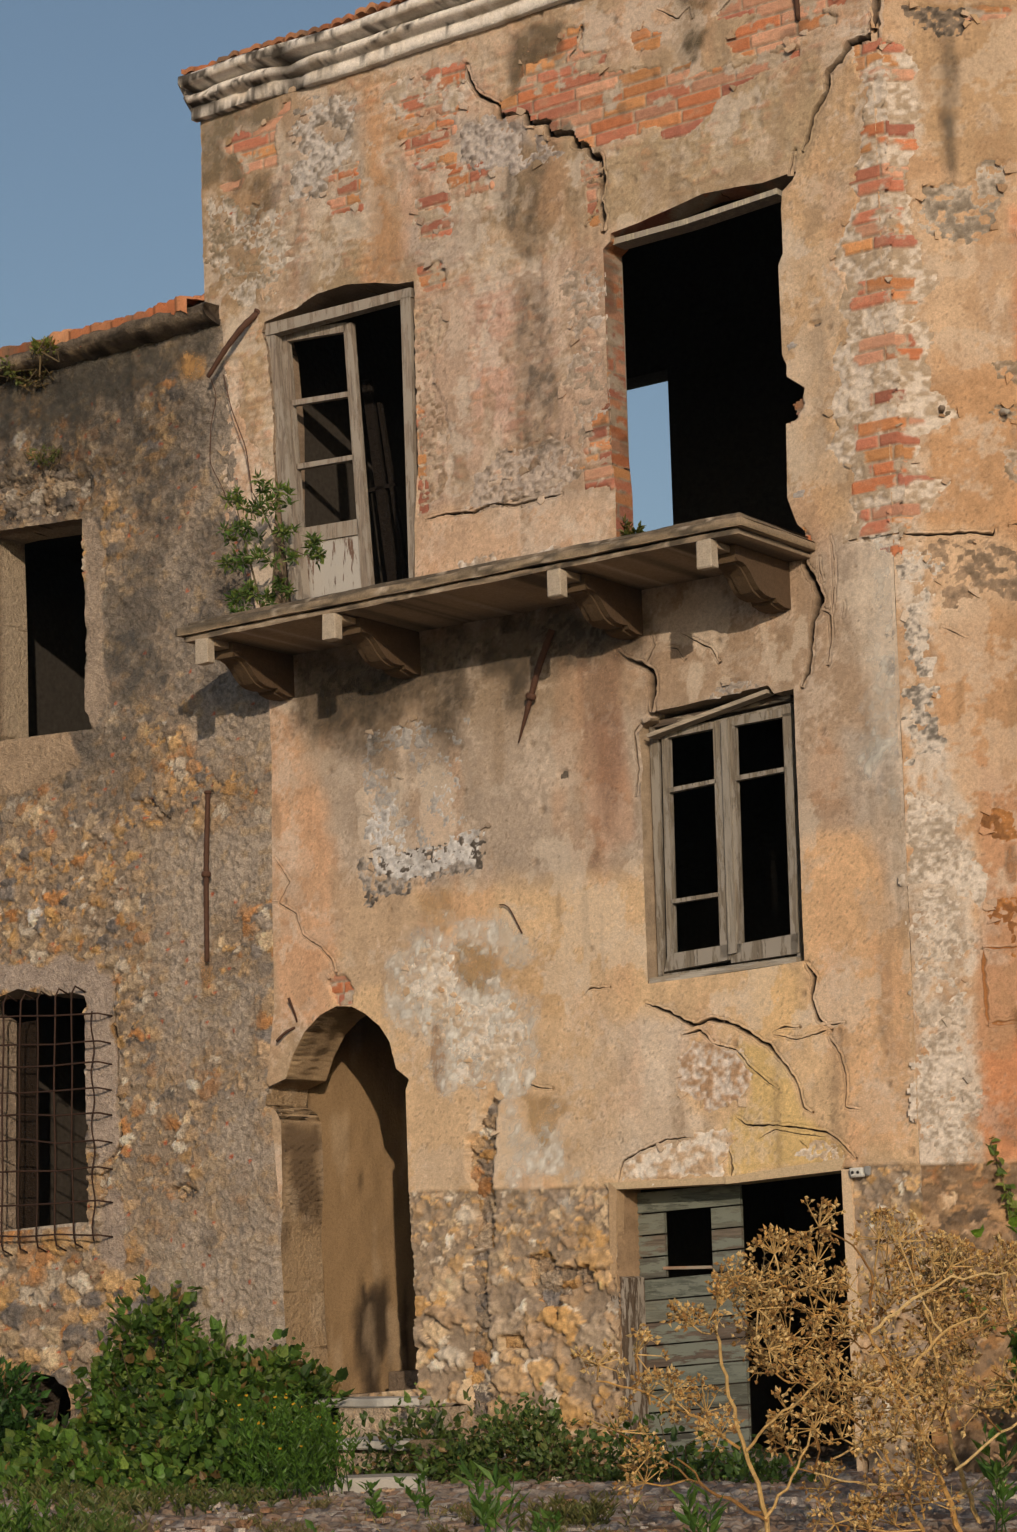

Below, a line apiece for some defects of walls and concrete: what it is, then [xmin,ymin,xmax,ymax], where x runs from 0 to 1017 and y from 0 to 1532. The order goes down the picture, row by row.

flaking render [203,95,364,307]
crack [464,65,609,231]
spalling [380,0,846,517]
crack [787,0,885,176]
flaking render [217,361,275,535]
crack [800,535,846,688]
spalling [823,37,1017,766]
crack [902,521,1017,539]
crack [616,631,722,796]
flaking render [356,715,491,908]
flaking render [621,1040,754,1181]
crack [645,962,862,1176]